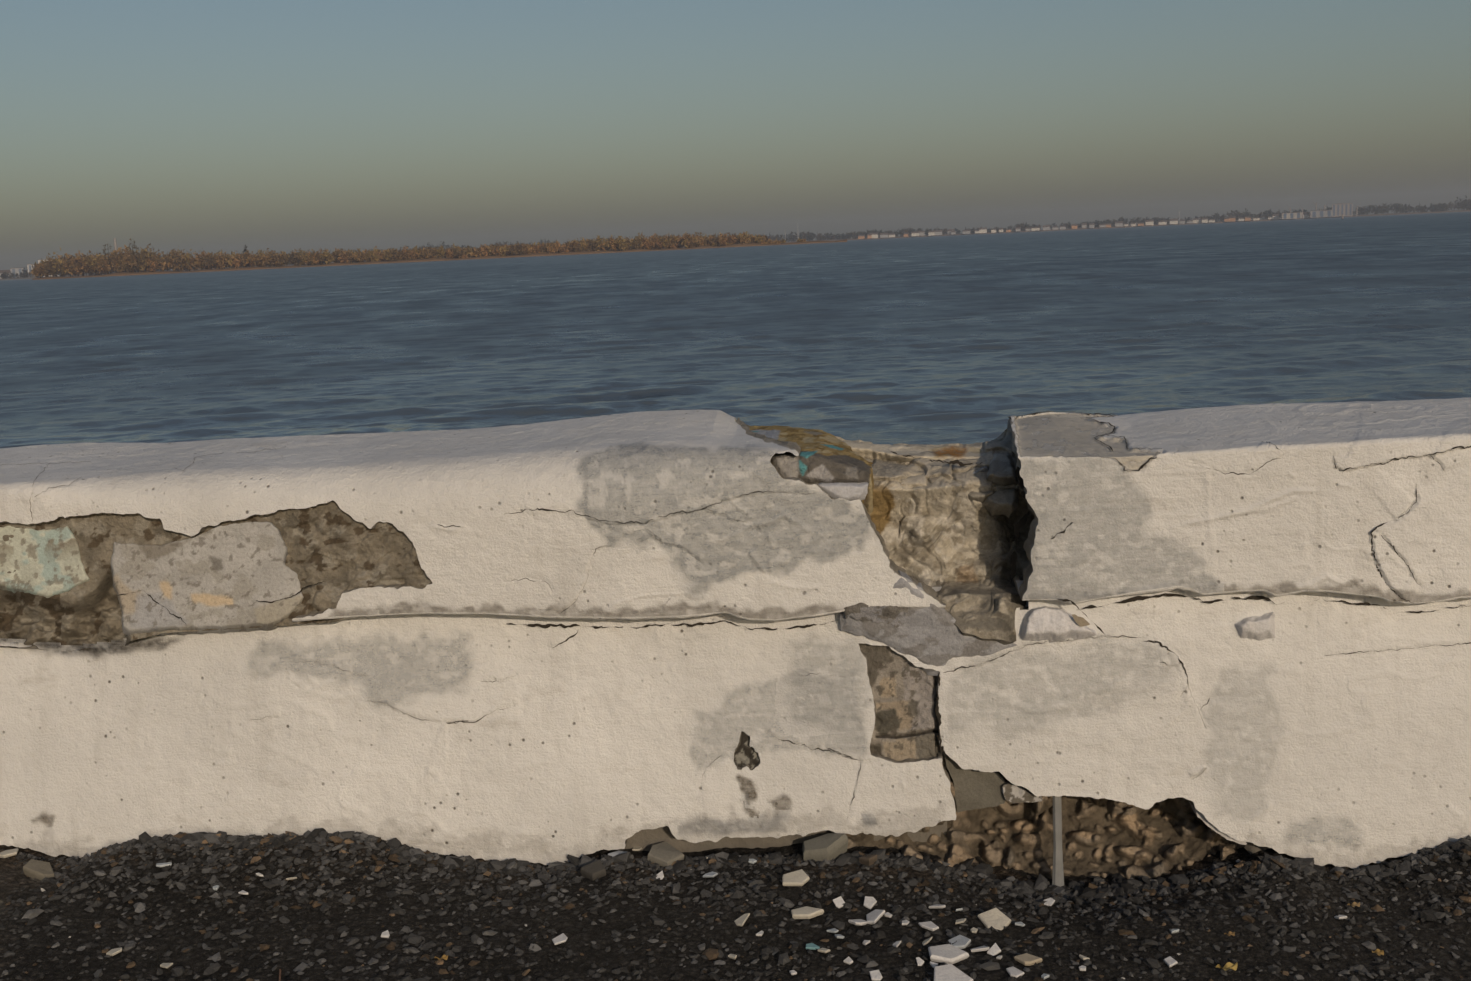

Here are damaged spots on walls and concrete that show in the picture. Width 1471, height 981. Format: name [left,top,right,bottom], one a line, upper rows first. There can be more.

spalling [0,500,432,650]
crack [505,491,838,648]
leakage [581,445,869,582]
spalling [735,411,1161,645]
crack [935,441,1471,755]
spalling [734,731,760,770]
spalling [858,643,956,810]
peeling [1188,800,1247,845]